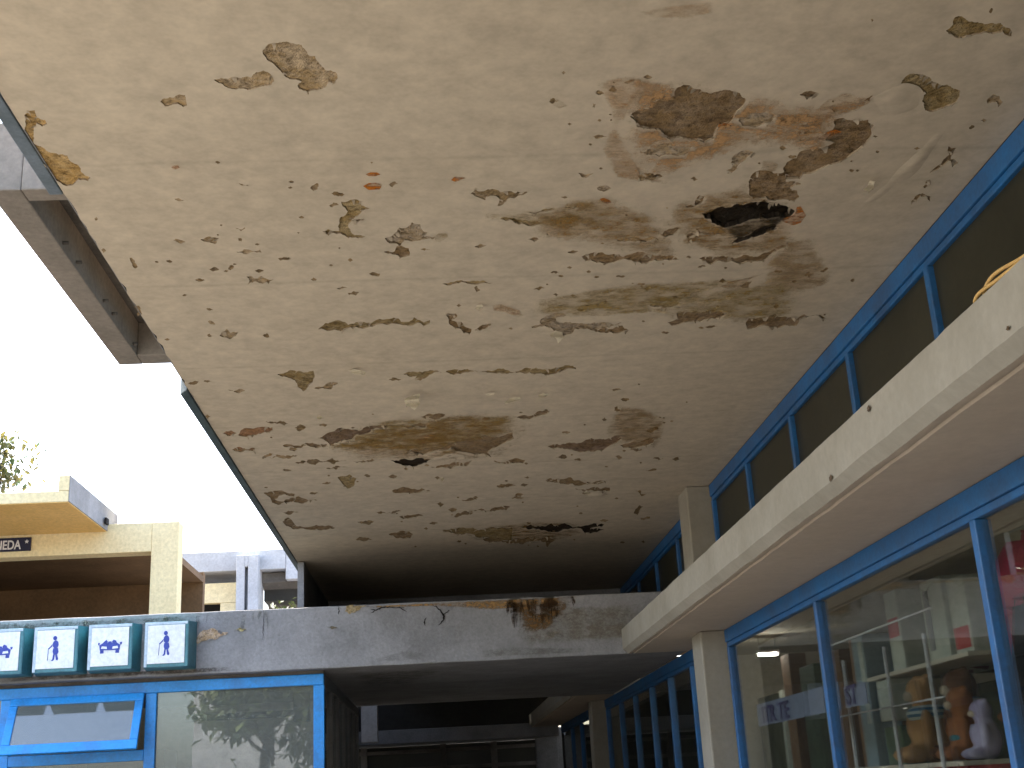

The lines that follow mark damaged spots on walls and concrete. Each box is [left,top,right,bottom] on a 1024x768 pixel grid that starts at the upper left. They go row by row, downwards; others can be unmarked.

peeling [947,8,1012,37]
peeling [216,42,337,95]
peeling [901,74,960,110]
peeling [24,110,89,184]
peeling [631,85,774,156]
peeling [728,101,879,228]
leakage [542,194,824,318]
peeling [320,317,430,332]
leakage [336,417,509,457]
peeling [224,394,554,547]
spalling [197,627,245,644]
crack [371,606,449,625]